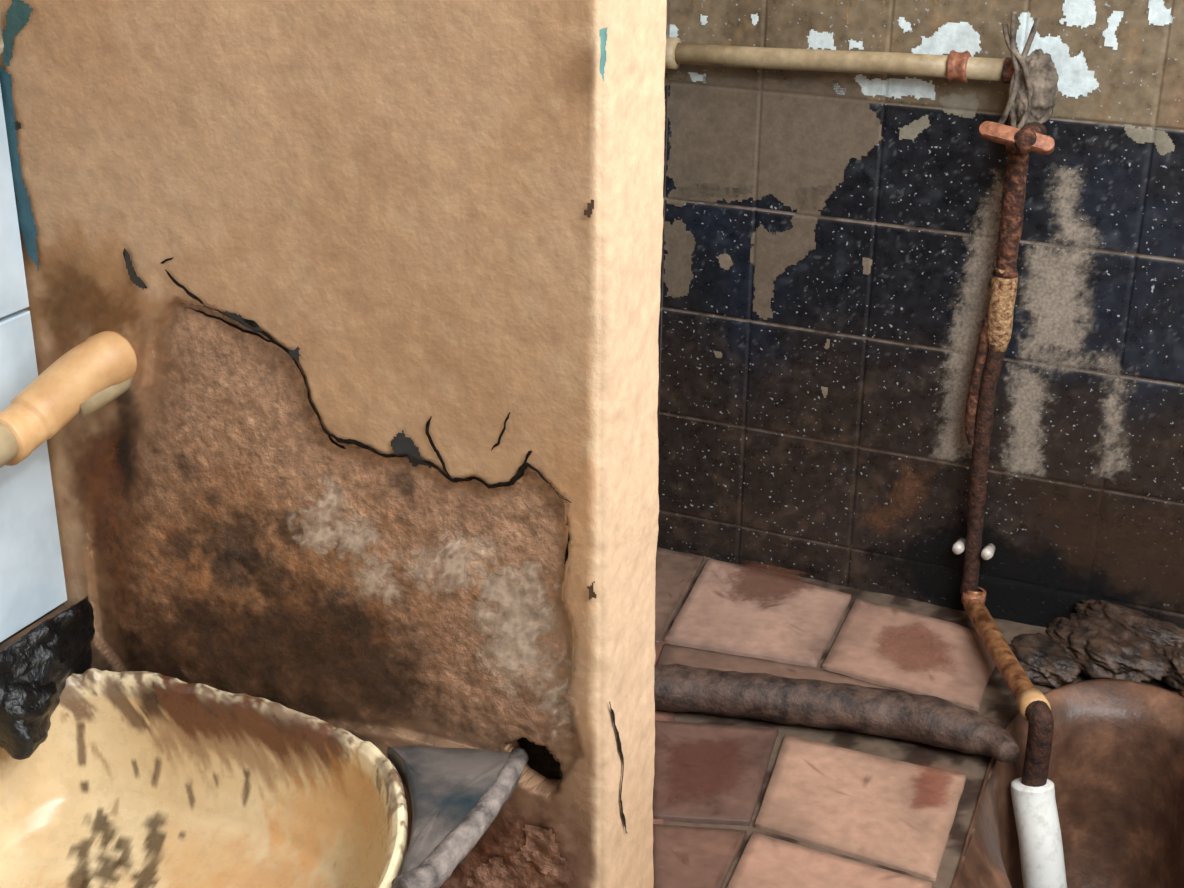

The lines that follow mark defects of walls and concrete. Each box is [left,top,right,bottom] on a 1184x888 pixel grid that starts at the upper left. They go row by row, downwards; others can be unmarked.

peeling [898,17,981,57]
peeling [1016,0,1124,99]
peeling [1148,0,1173,26]
peeling [663,72,980,320]
water stain [933,170,1004,461]
water stain [1003,168,1127,477]
peeling [102,301,568,760]
water stain [291,487,401,603]
water stain [412,539,477,591]
water stain [128,606,421,712]
water stain [478,551,572,737]
flaking render [440,808,574,888]